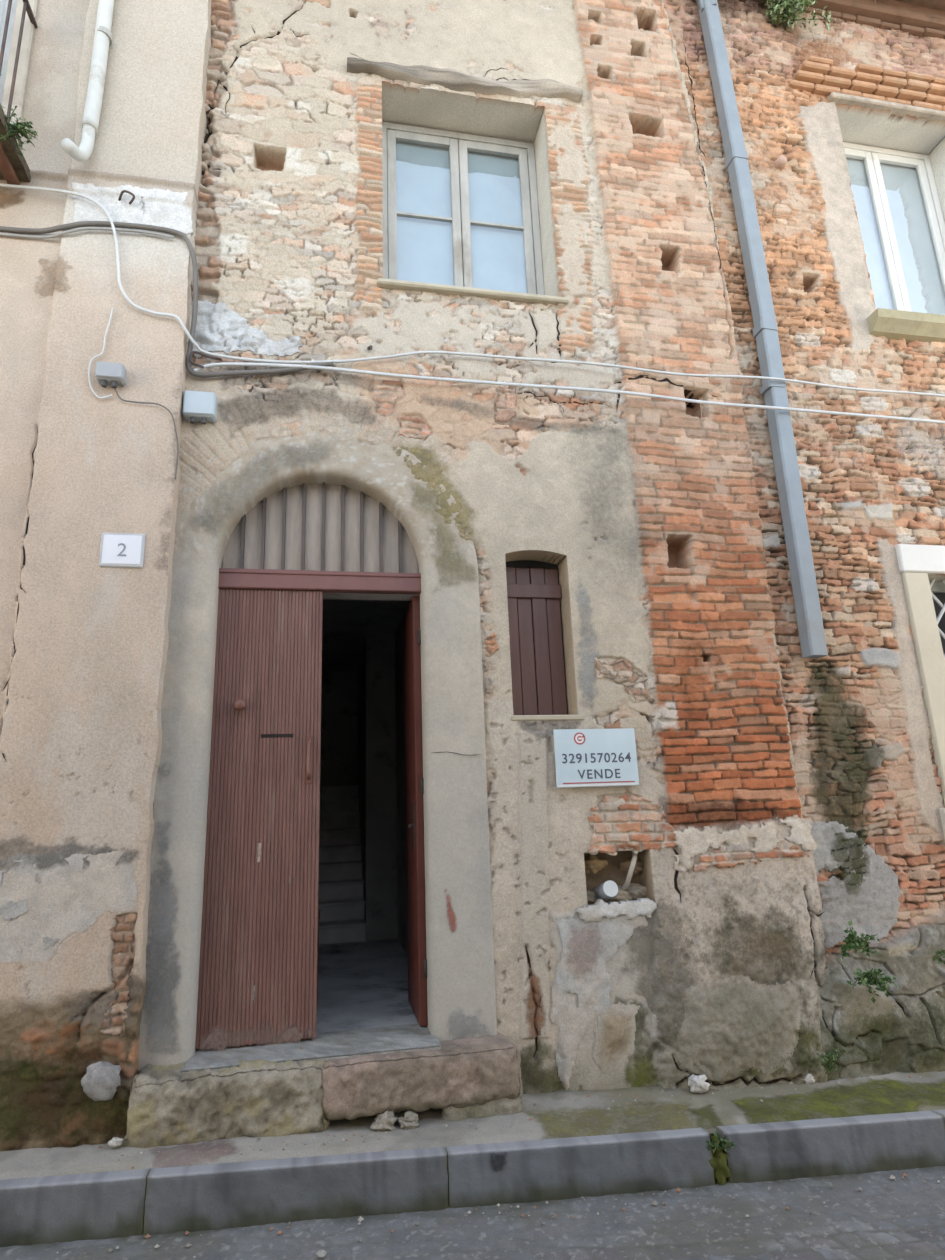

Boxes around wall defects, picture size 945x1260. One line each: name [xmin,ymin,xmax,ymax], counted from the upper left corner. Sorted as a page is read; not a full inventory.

crack [3,429,38,710]
water stain [807,662,884,833]
peeling [0,849,139,1036]
crack [806,898,824,980]